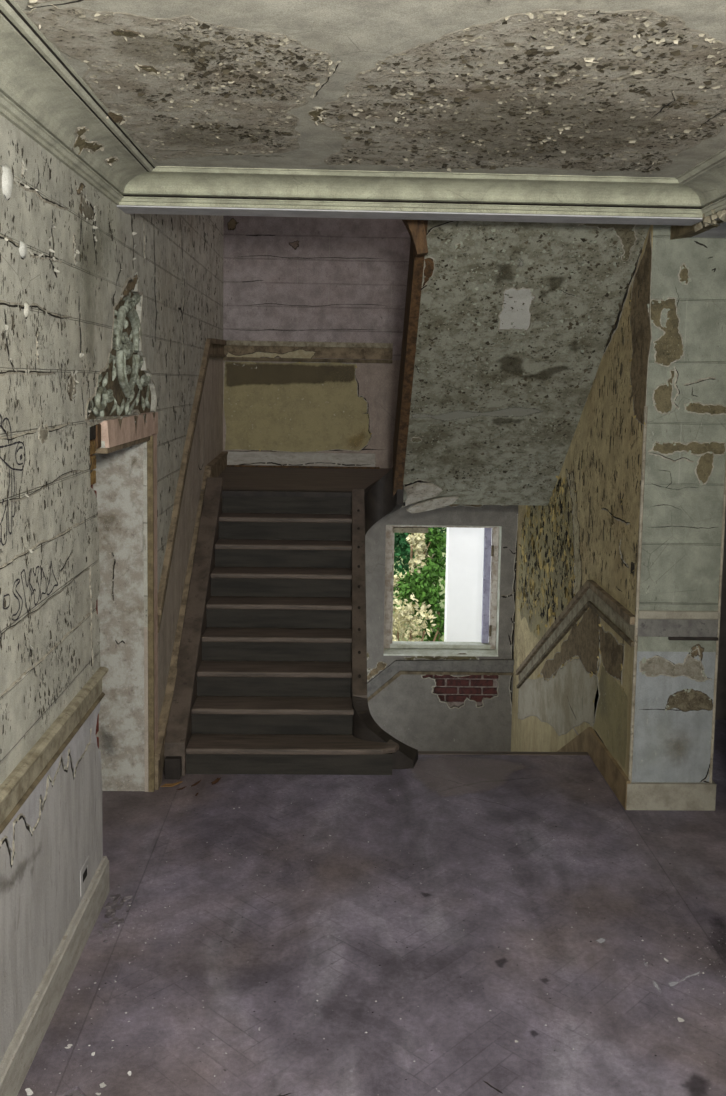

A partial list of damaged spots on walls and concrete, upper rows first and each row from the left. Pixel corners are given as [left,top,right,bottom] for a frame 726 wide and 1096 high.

peeling [24,0,726,174]
peeling [223,349,372,452]
peeling [403,223,726,641]
flaking render [421,675,500,709]
peeling [517,607,628,770]
peeling [639,644,713,712]
peeling [0,714,102,1063]